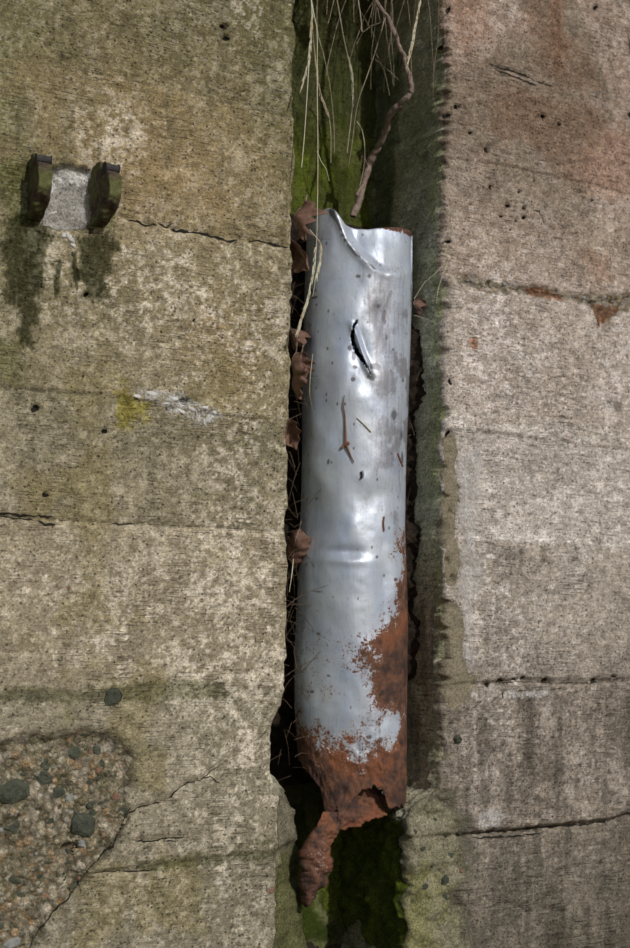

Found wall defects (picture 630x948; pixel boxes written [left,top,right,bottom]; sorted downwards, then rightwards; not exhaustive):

water stain [2,215,51,346]
water stain [55,231,120,295]
crack [129,220,289,248]
spalling [0,728,134,948]
crack [27,757,236,947]
corrosion [336,786,387,831]